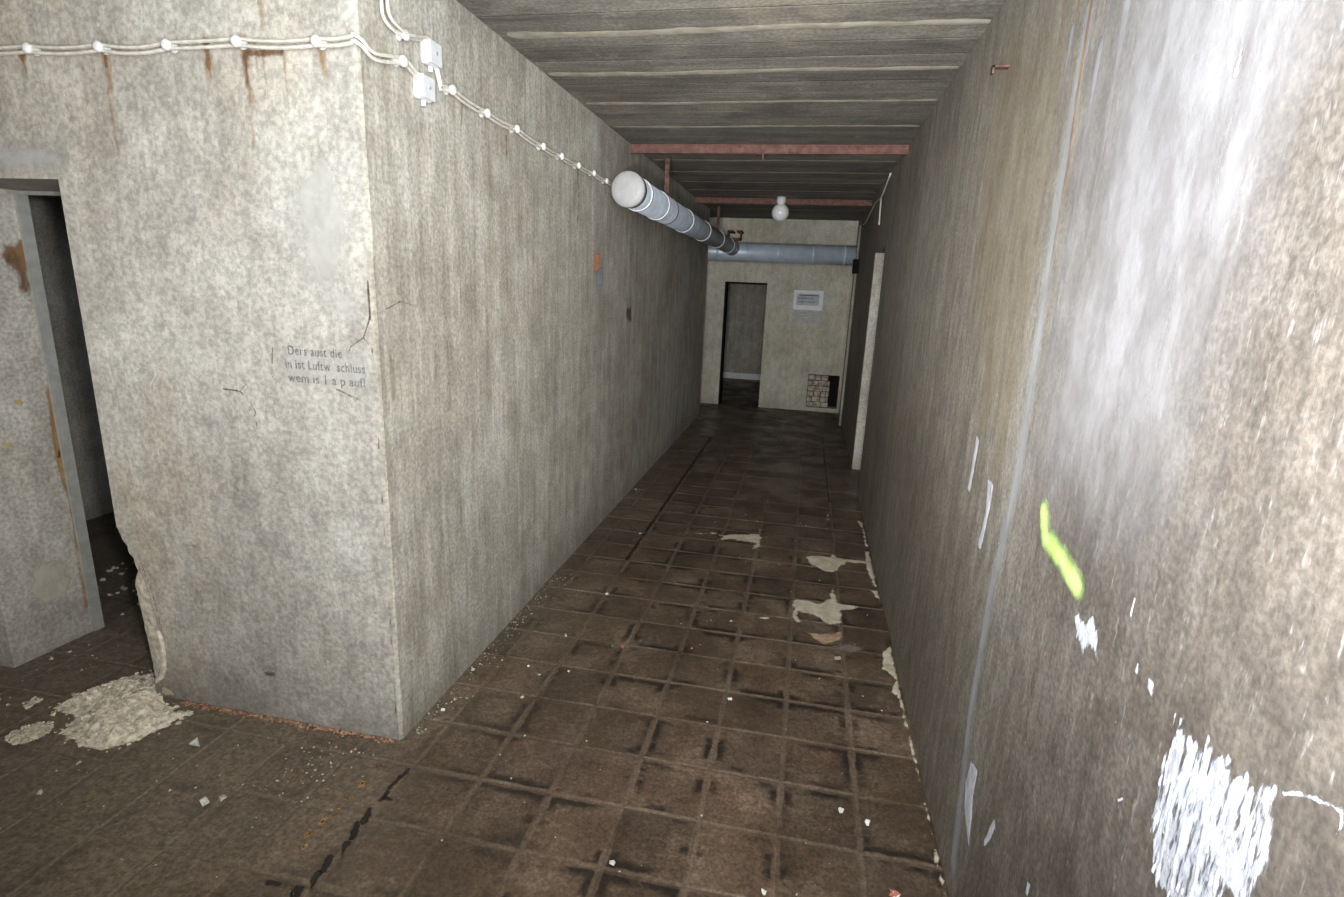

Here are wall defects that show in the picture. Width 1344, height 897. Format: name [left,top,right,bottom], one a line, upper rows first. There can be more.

rust [241,50,283,98]
rust [2,241,30,292]
rust [47,387,77,547]
flaking render [116,526,175,695]